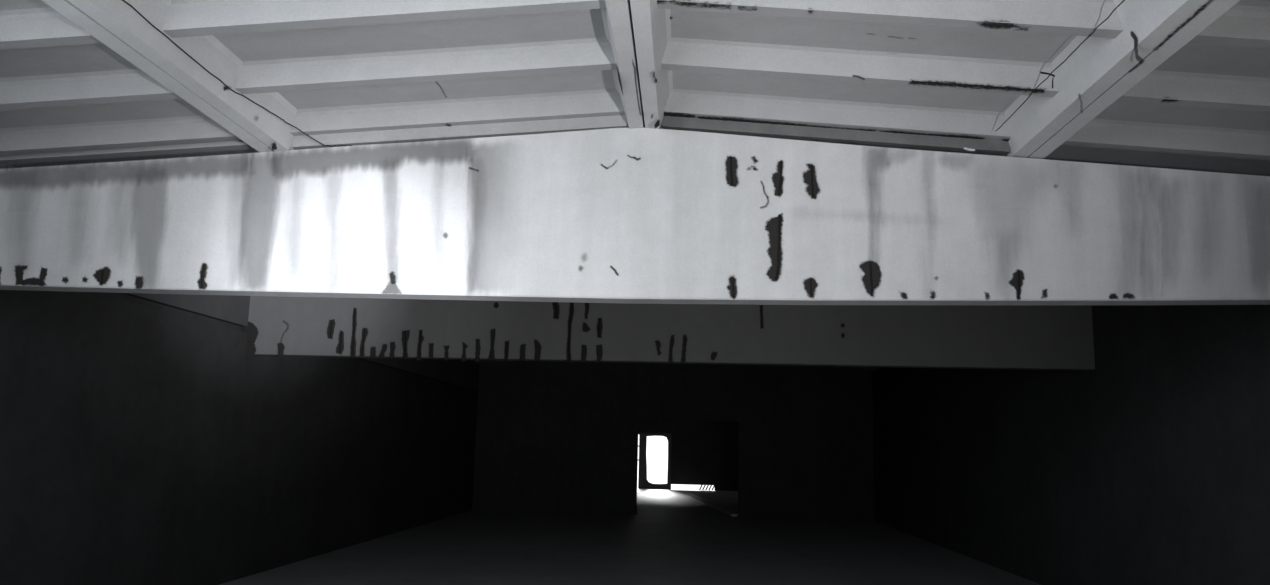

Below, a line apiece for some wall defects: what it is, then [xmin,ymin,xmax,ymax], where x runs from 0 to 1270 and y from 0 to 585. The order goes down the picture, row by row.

crack [1129,0,1211,73]
spalling [910,72,1055,93]
water stain [273,142,468,176]
spalling [725,156,757,187]
spalling [772,160,784,197]
spalling [803,164,820,199]
spalling [765,213,783,281]
spalling [0,265,47,286]
spalling [83,267,143,289]
spalling [860,261,881,296]
spalling [1009,269,1024,300]
spalling [327,308,542,362]